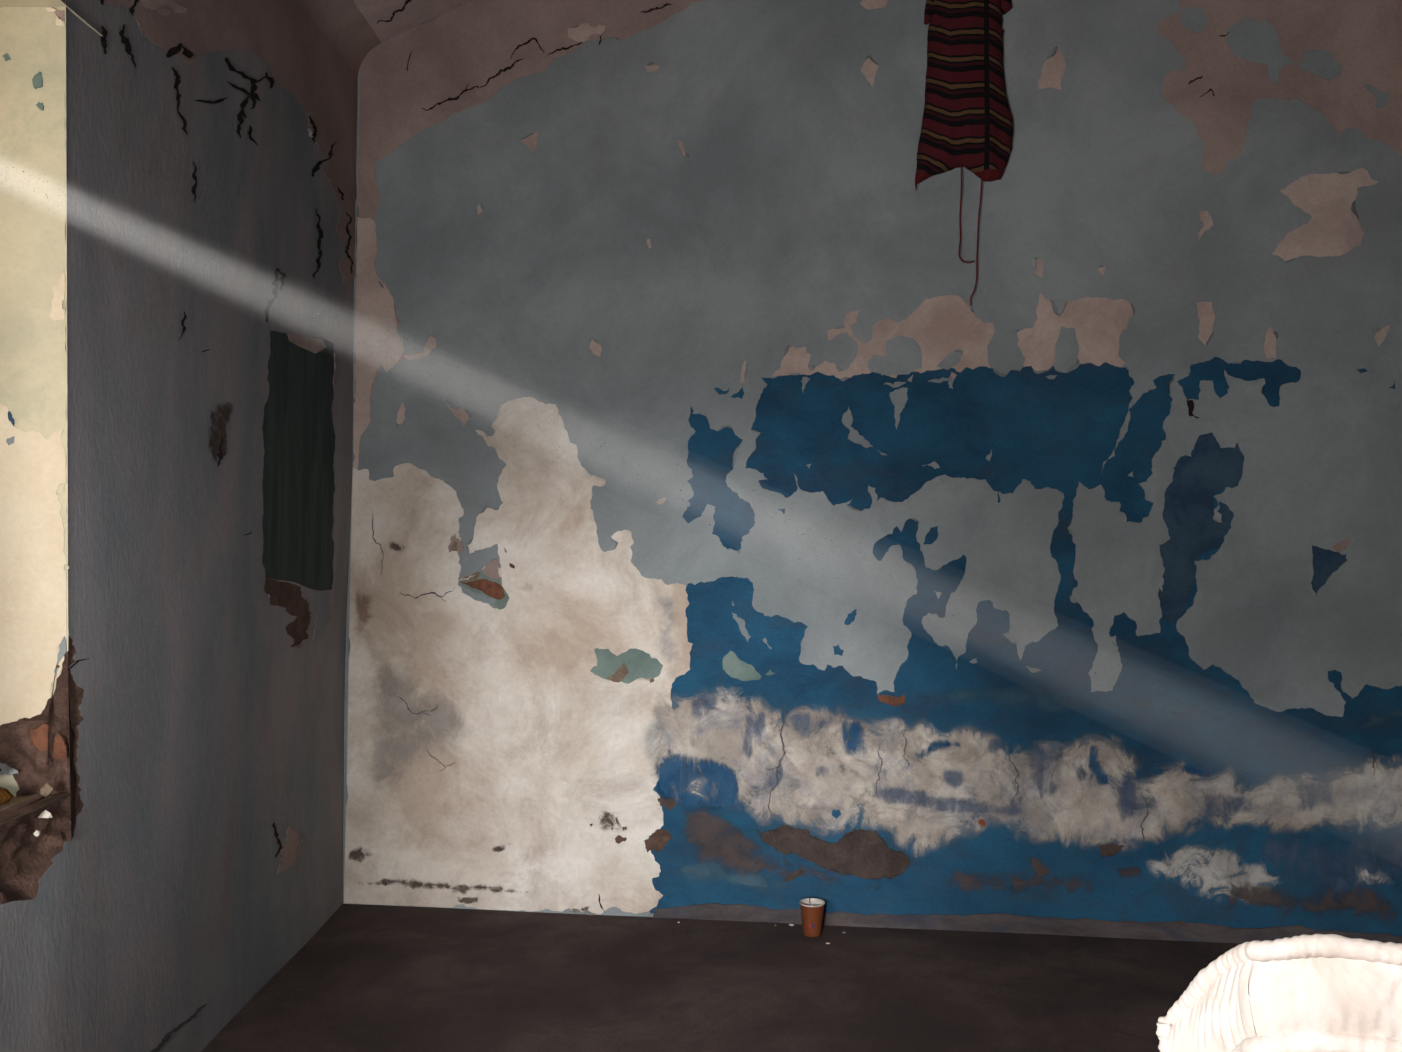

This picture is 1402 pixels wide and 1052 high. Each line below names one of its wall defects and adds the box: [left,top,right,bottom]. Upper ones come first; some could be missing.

flaking render [46,7,65,26]
crack [377,0,411,24]
crack [640,3,672,13]
crack [100,0,274,202]
crack [422,34,602,111]
crack [264,116,353,323]
peeling [1272,167,1378,265]
peeling [50,270,66,322]
crack [179,311,210,352]
peeling [262,330,336,649]
peeling [343,217,1402,936]
peeling [0,403,84,906]